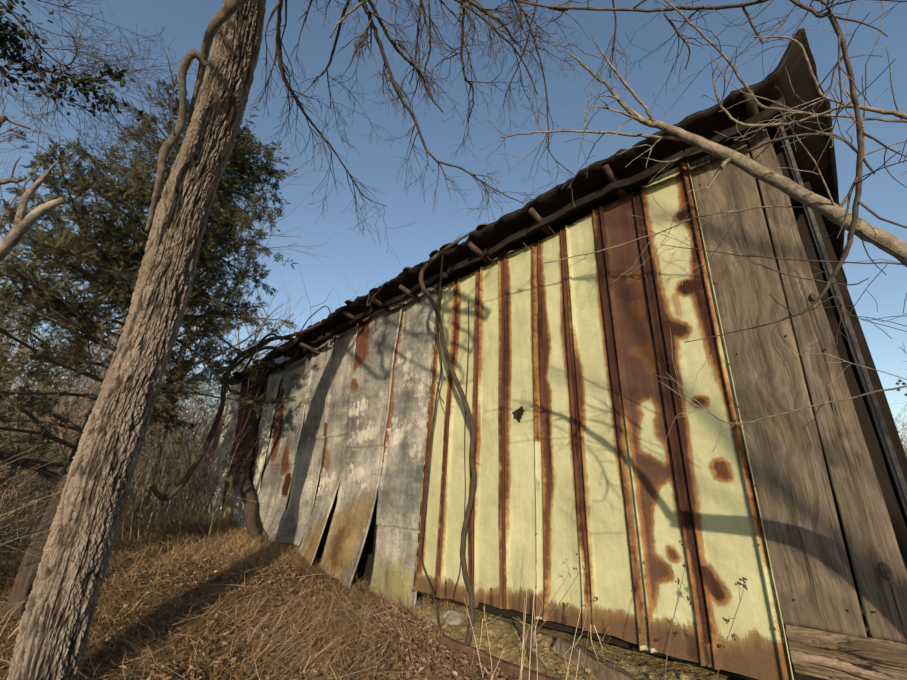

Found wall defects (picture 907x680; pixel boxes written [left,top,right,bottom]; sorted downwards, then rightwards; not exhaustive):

corrosion [351,314,373,391]
corrosion [223,368,270,503]
corrosion [270,388,291,498]
corrosion [412,162,792,680]